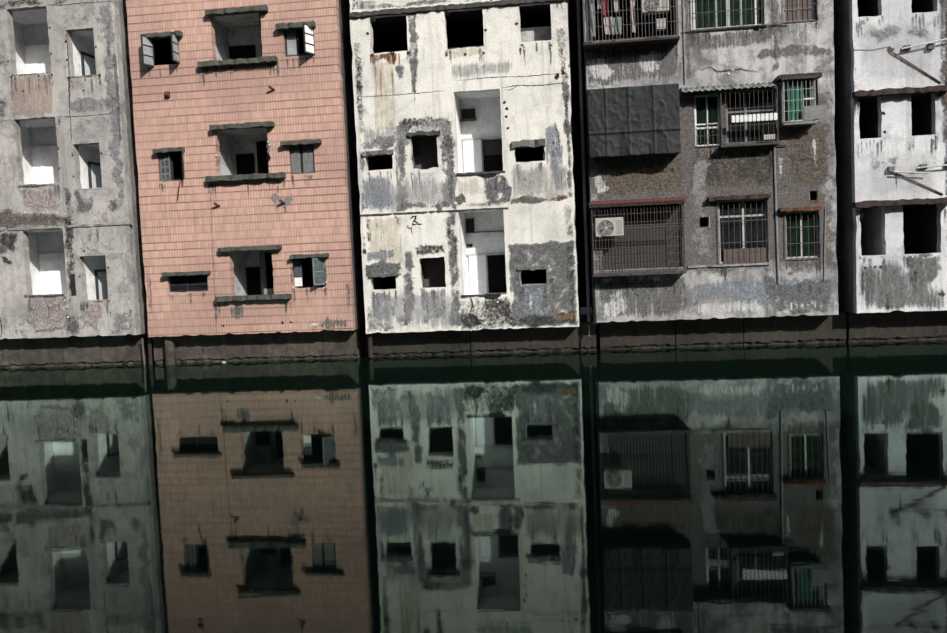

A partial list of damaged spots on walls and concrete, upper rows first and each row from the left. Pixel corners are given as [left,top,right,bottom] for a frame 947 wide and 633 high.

leakage [0,0,40,8]
leakage [70,3,124,211]
corrosion [370,51,410,65]
leakage [352,0,449,99]
leakage [360,30,578,331]
leakage [859,0,947,151]
leakage [0,185,132,332]
leakage [861,255,944,309]